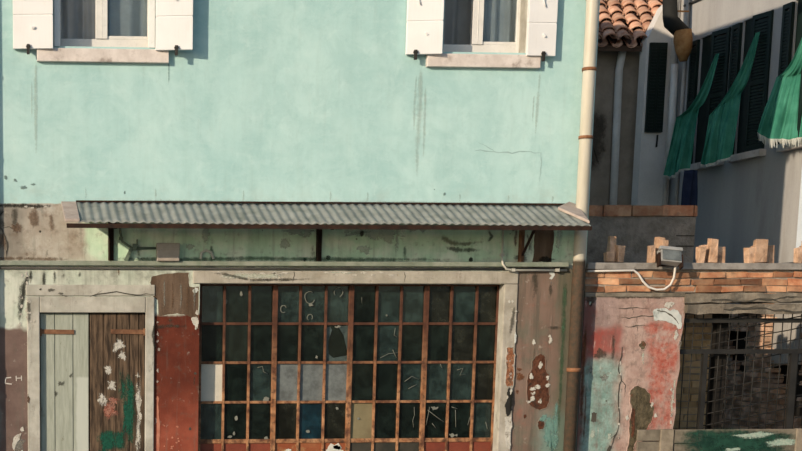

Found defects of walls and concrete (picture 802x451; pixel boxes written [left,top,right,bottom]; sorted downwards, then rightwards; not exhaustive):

crack [475,143,542,182]
water stain [591,116,605,167]
peeling [149,271,200,352]
peeling [653,302,682,349]
flaking render [504,300,558,451]
flaking render [625,385,657,451]